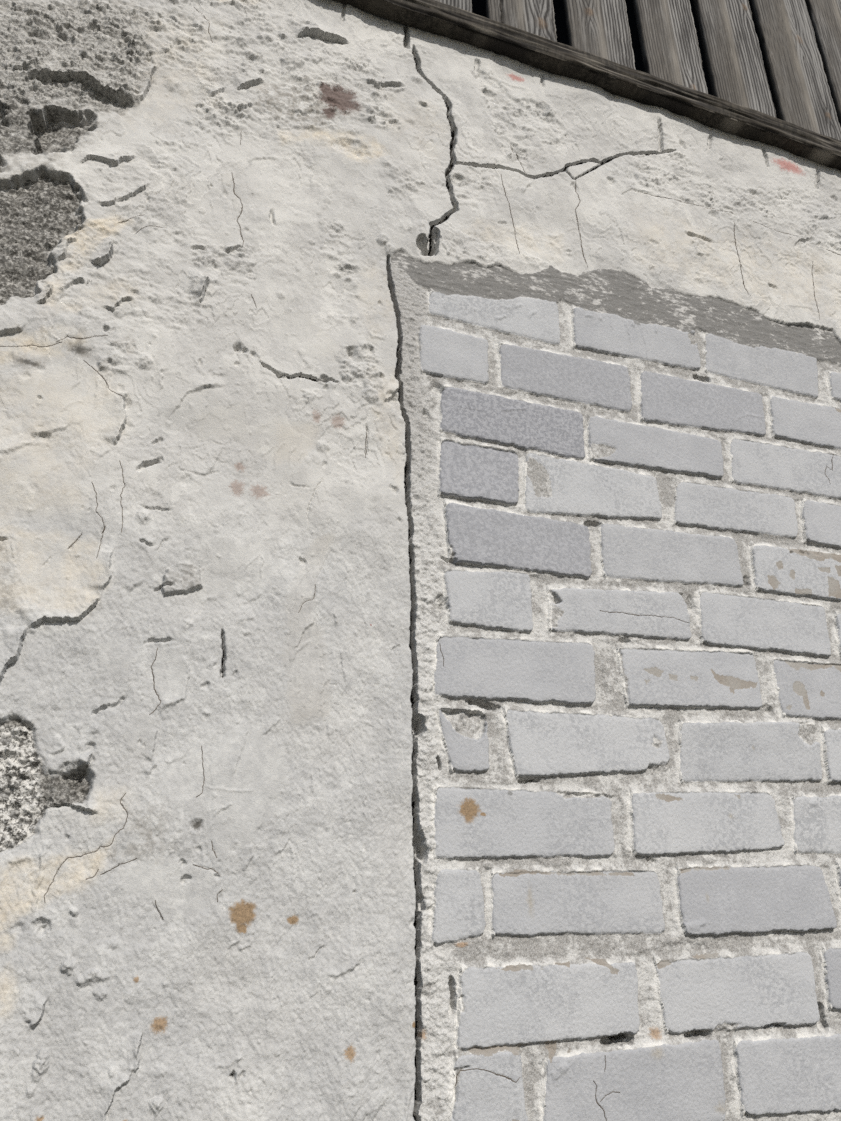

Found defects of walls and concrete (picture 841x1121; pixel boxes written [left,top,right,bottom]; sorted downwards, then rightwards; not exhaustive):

spalling [0,0,167,113]
spalling [0,174,83,306]
crack [428,98,673,262]
crack [404,430,412,565]
spalling [0,717,97,851]
spalling [0,545,120,692]
crack [408,601,416,716]
crack [409,748,417,840]
spalling [440,705,488,742]
corrosion [454,792,488,826]
corrosion [224,896,262,935]
crack [411,914,419,1119]